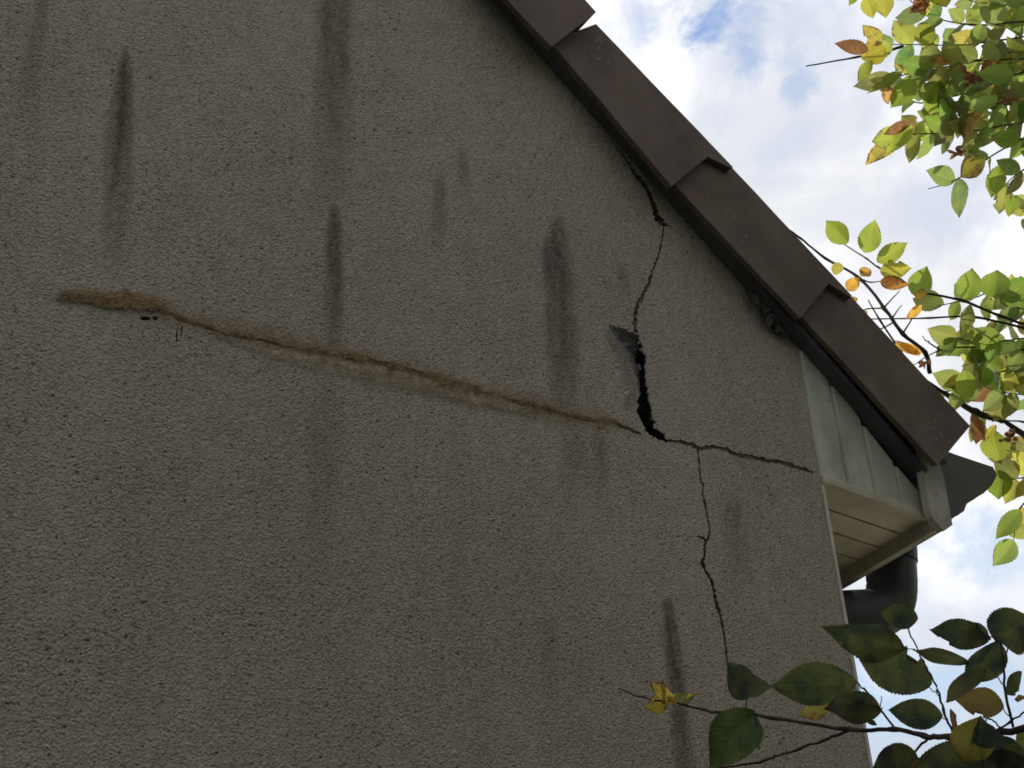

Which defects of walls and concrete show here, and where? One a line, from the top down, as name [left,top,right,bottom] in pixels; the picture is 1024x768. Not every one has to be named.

crack [57,149,812,654]